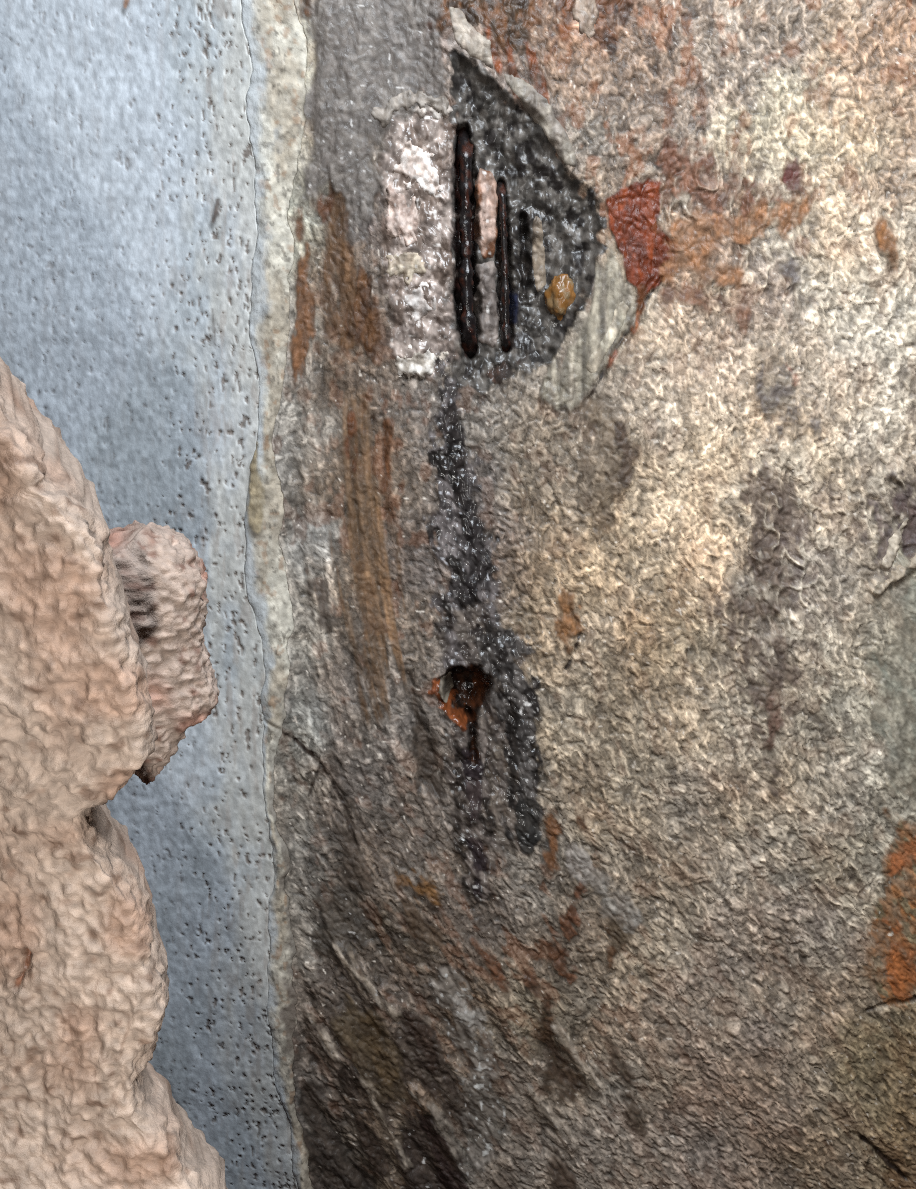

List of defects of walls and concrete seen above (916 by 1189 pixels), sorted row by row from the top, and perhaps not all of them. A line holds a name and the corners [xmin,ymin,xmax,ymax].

spalling [304,0,636,410]
corrosion [606,137,810,333]
water stain [423,352,550,901]
corrosion [867,810,916,1003]